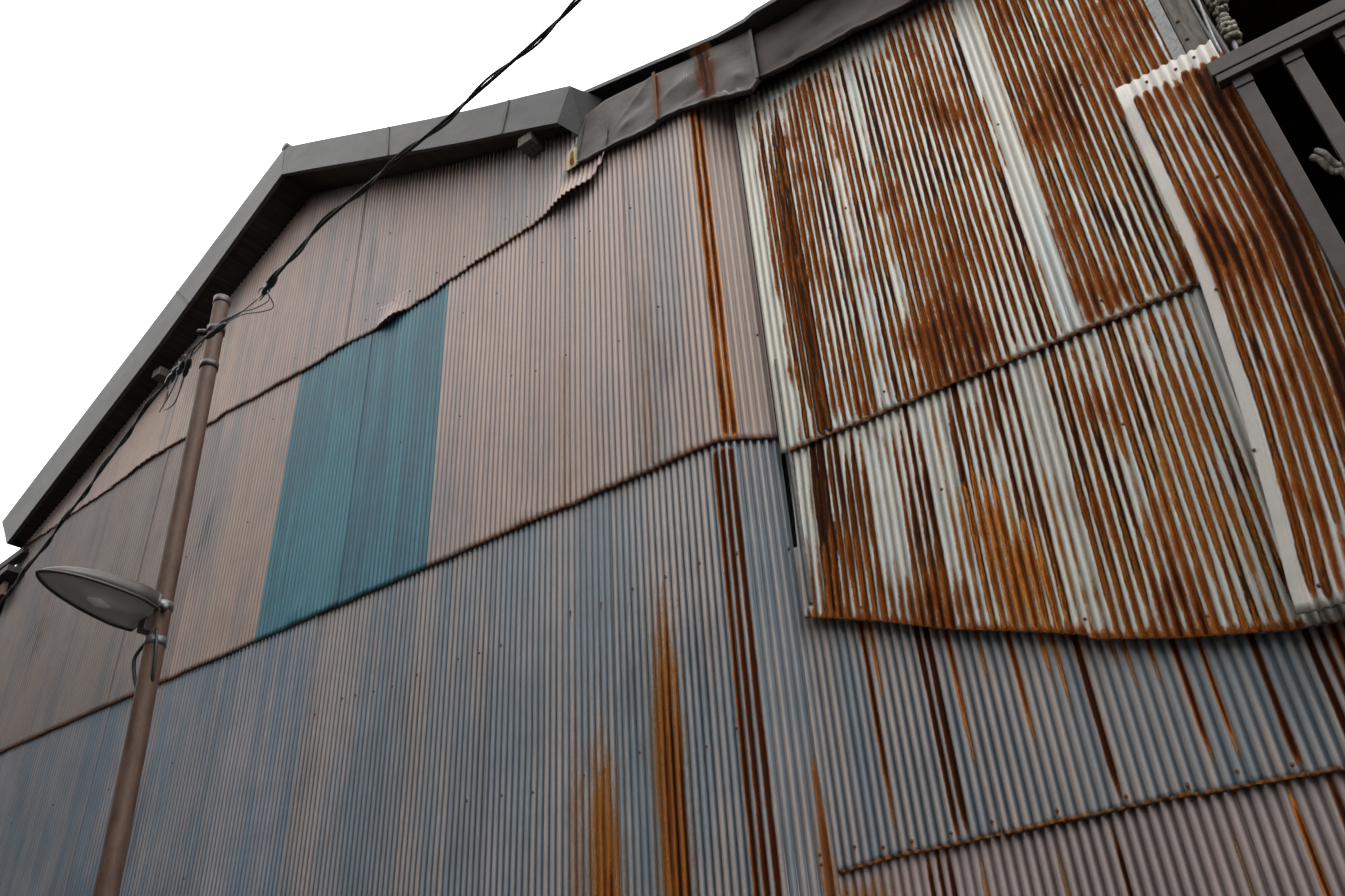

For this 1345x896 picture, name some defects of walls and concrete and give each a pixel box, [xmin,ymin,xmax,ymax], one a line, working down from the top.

rust [469,42,782,896]
rust [752,0,1345,896]